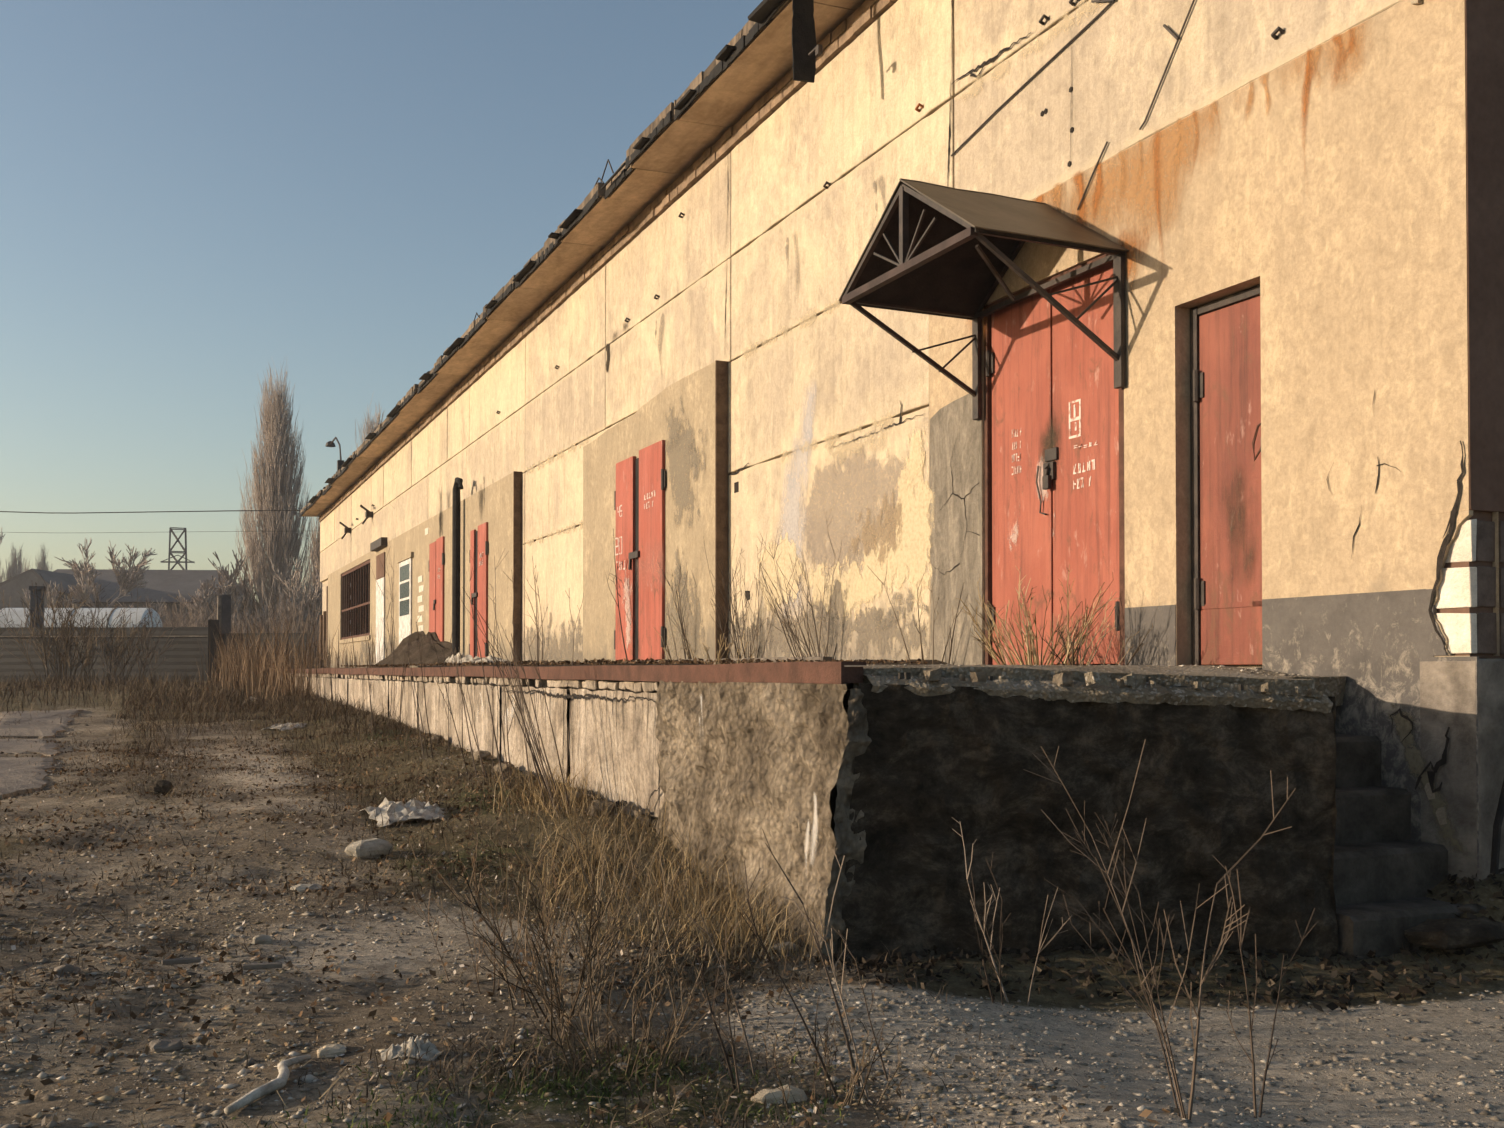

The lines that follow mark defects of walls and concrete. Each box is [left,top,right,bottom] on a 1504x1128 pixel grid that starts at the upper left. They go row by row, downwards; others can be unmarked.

corrosion [1247,75,1269,110]
corrosion [1302,26,1360,118]
corrosion [1034,104,1216,232]
corrosion [1119,236,1140,275]
crack [934,442,979,575]
crack [1327,457,1401,557]
spalling [1426,510,1504,658]